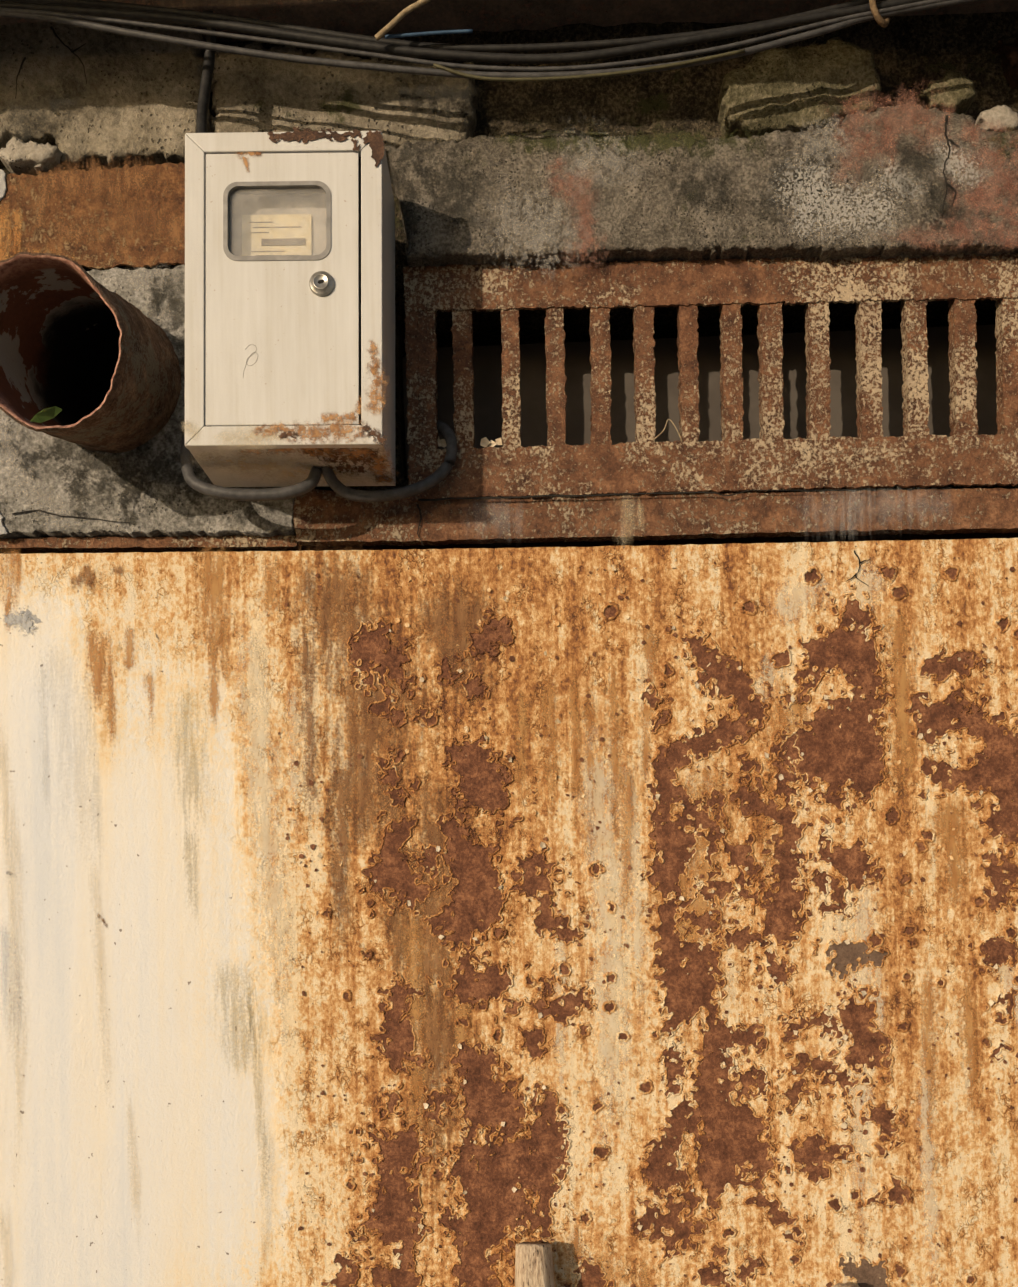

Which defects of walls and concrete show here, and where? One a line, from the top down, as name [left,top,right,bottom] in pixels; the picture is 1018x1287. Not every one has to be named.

corrosion [0,210,39,261]
corrosion [37,161,185,255]
crack [942,115,958,217]
corrosion [239,341,393,482]
damp [0,429,203,524]
corrosion [554,1209,588,1285]